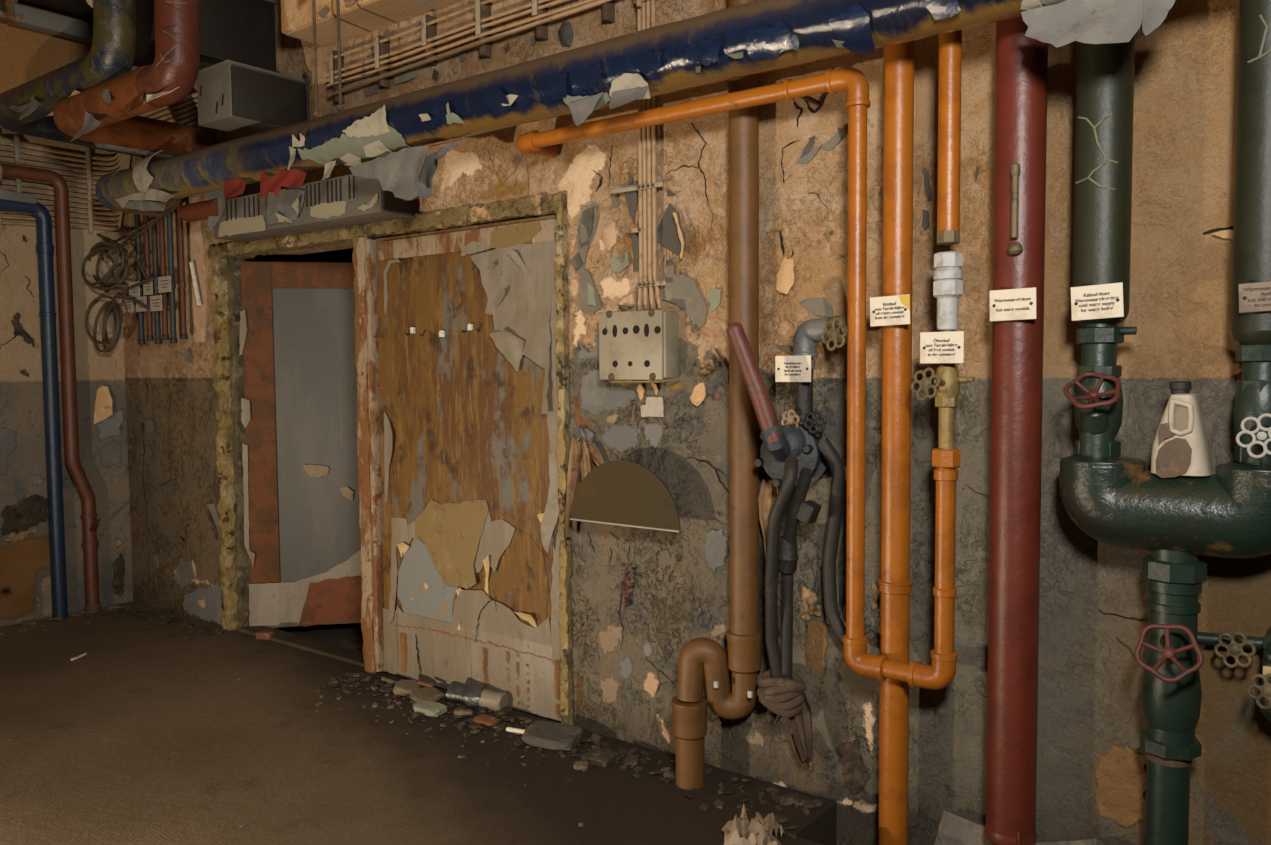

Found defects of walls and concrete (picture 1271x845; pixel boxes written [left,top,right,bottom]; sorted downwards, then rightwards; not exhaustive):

peeling [384,259,401,319]
peeling [657,189,721,328]
peeling [94,386,127,477]
corrosion [241,261,355,583]
peeling [384,411,393,503]
peeling [389,144,668,704]
flaking render [0,494,48,542]
flaking render [1094,745,1147,828]